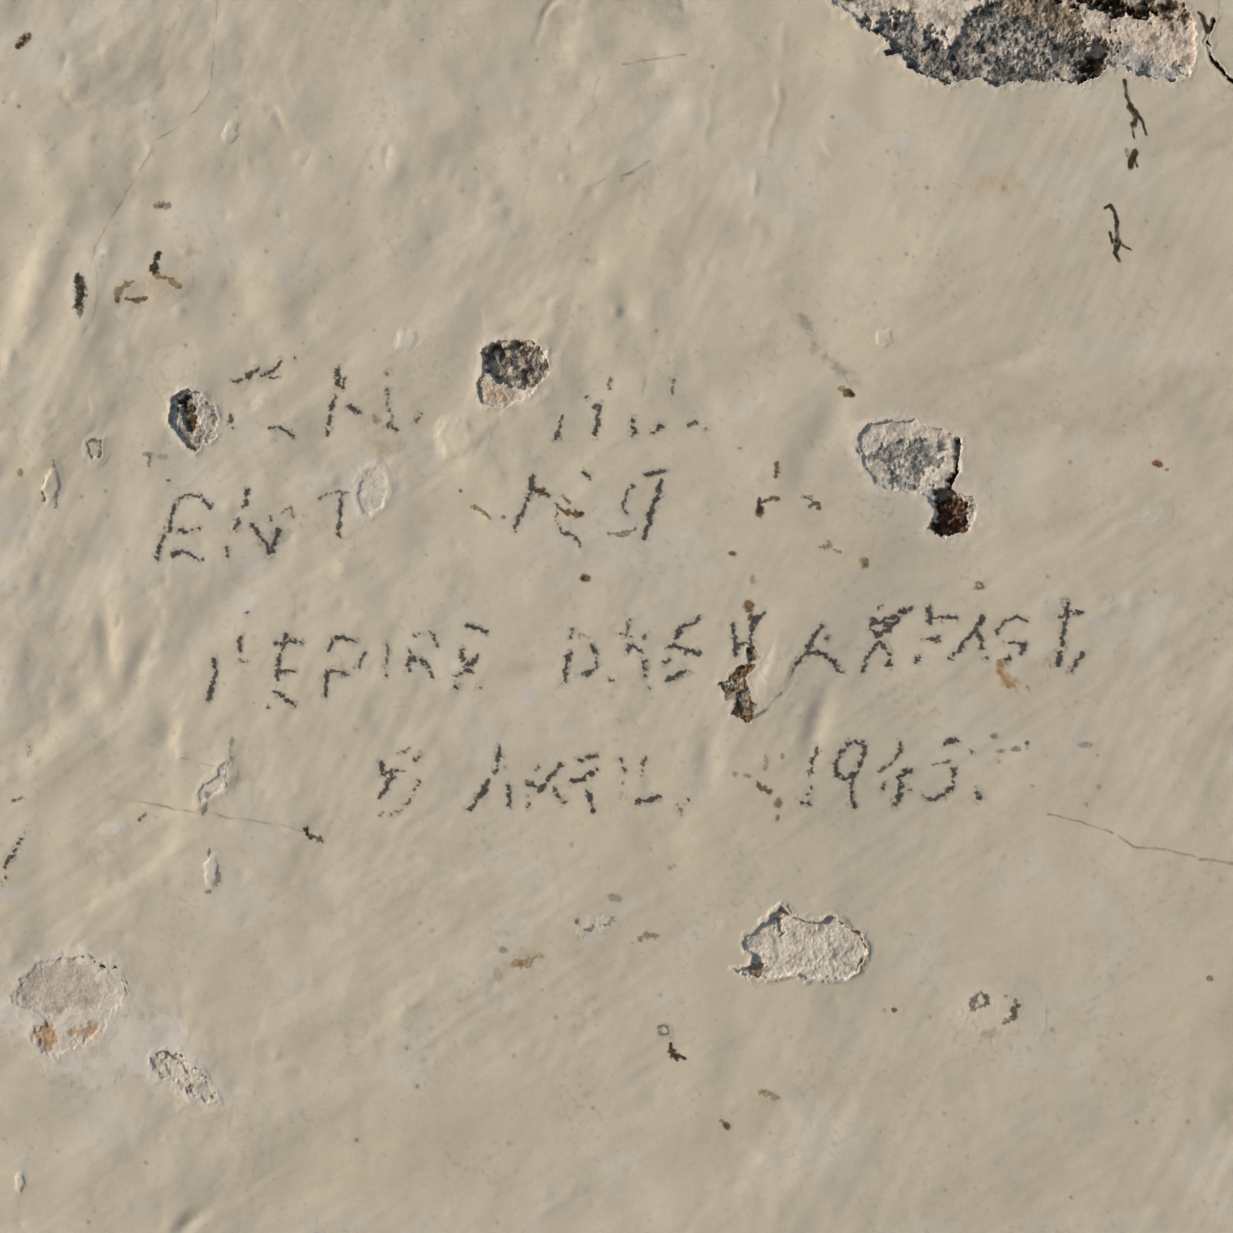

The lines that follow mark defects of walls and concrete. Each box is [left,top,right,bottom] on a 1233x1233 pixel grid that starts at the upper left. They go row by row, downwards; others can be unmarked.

spalling [818,0,1211,99]
crack [1197,11,1233,90]
spalling [156,379,229,466]
spalling [460,324,564,424]
spalling [838,386,993,554]
peeling [727,899,874,987]
peeling [0,931,147,1084]
peeling [137,1037,239,1117]